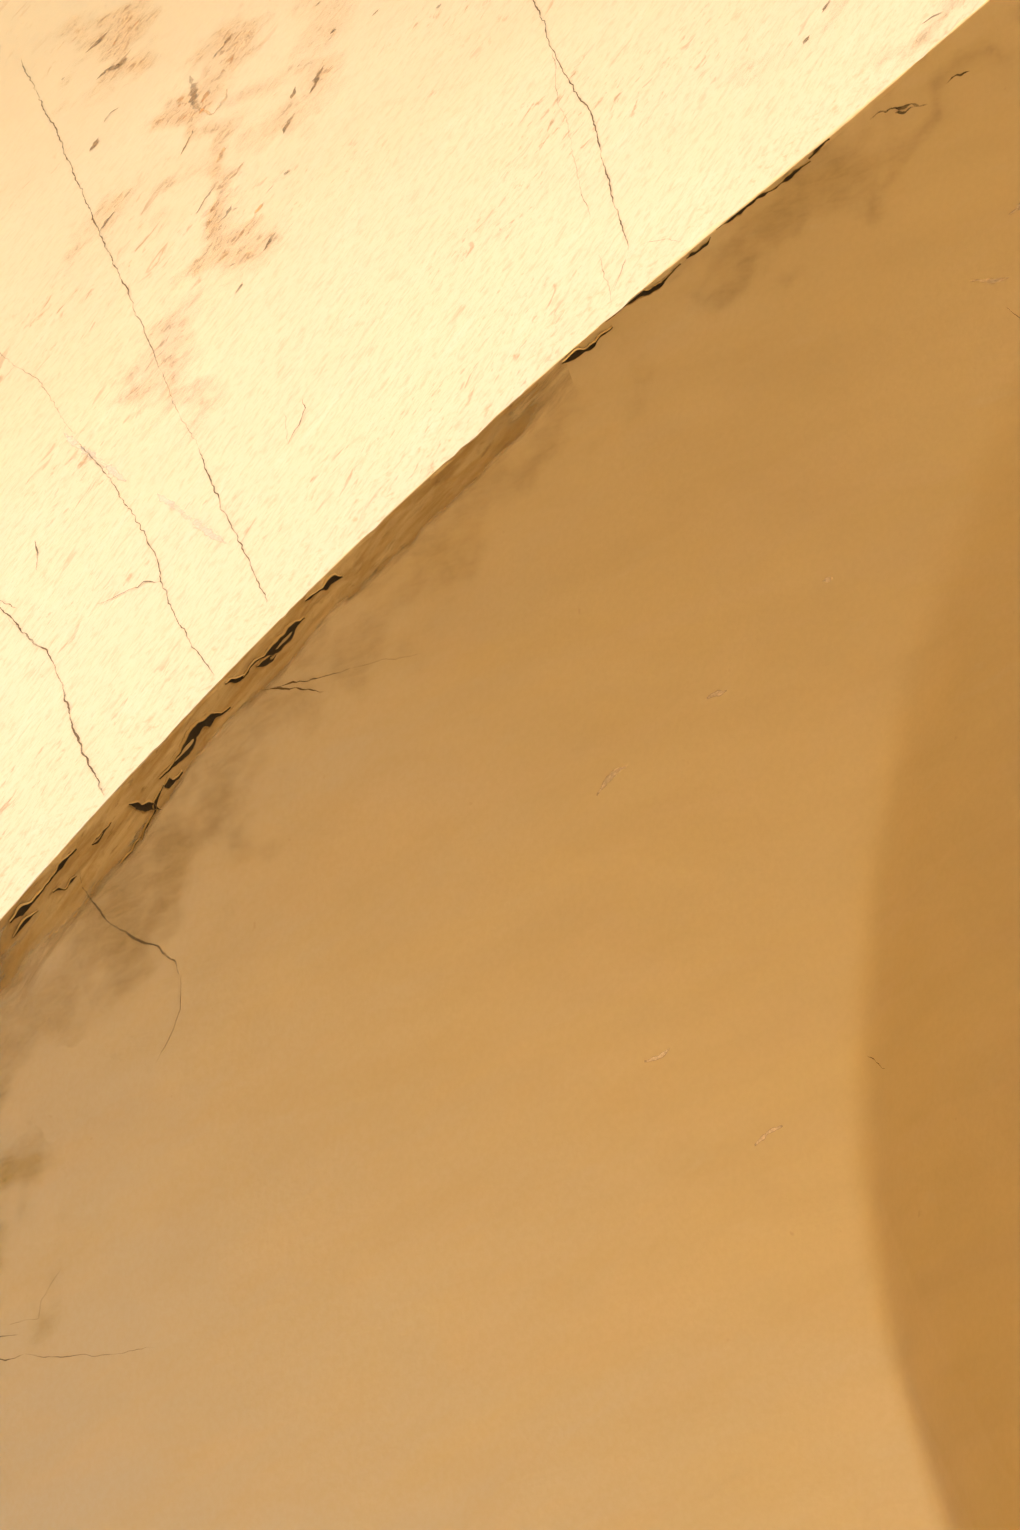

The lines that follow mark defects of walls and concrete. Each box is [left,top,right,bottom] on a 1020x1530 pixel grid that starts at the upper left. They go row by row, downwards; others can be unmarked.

crack [22,66,159,367]
crack [533,0,628,244]
crack [80,444,212,672]
crack [200,454,266,598]
spalling [0,138,830,992]
crack [0,600,102,790]
crack [87,894,181,1051]